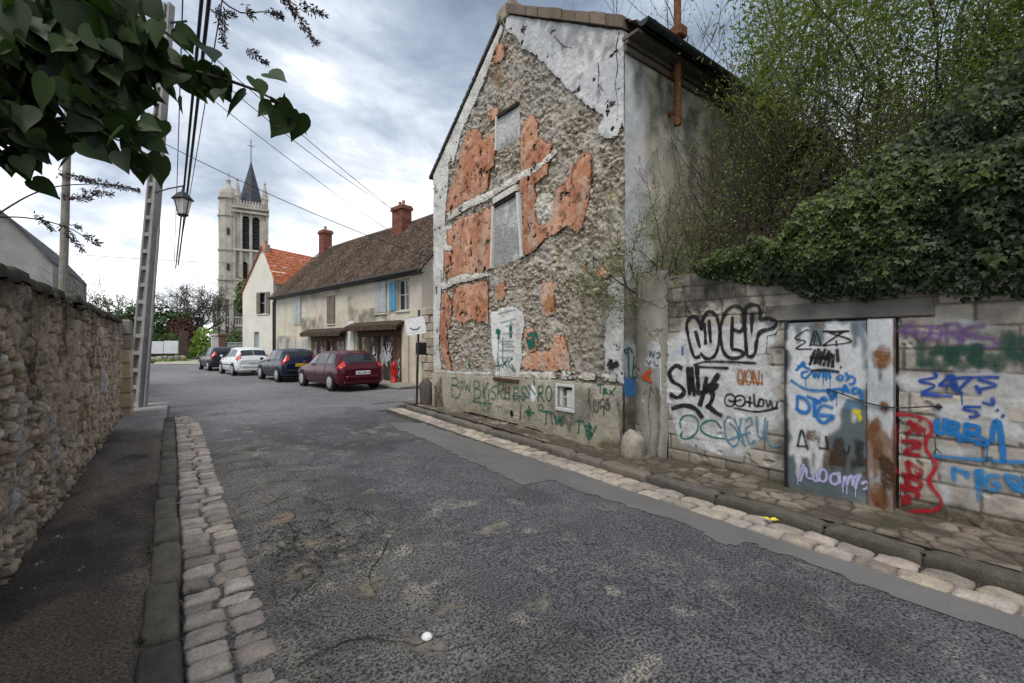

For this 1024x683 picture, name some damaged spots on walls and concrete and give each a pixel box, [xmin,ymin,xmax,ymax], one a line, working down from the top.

spalling [433,15,627,384]
rust [874,349,891,377]
rust [806,402,895,509]